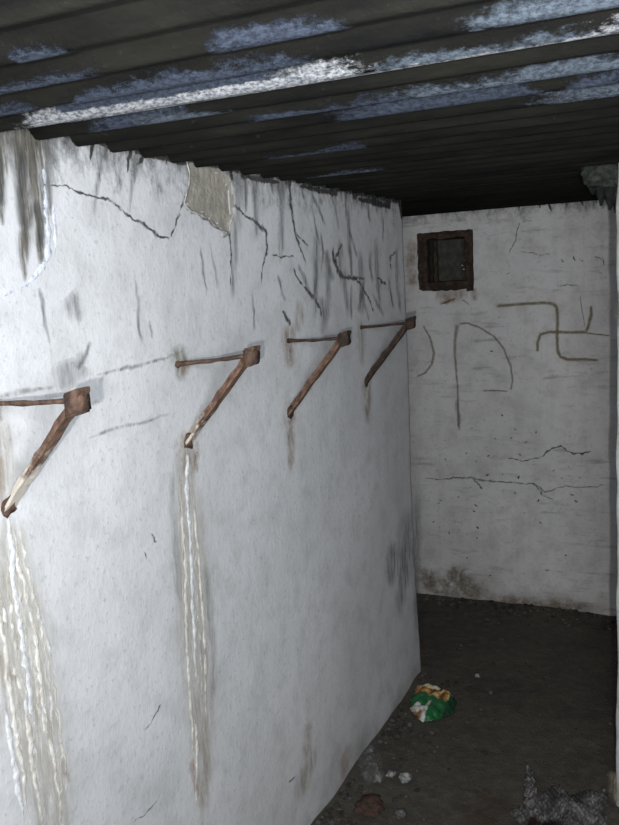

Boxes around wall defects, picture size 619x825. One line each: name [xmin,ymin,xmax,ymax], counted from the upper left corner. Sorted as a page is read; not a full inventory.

water stain [0,128,57,296]
crack [51,185,183,238]
flaking render [184,161,234,238]
crack [235,180,321,314]
crack [332,244,386,310]
crack [429,477,600,499]
crack [509,445,590,461]
water stain [0,516,67,825]
water stain [179,448,208,818]